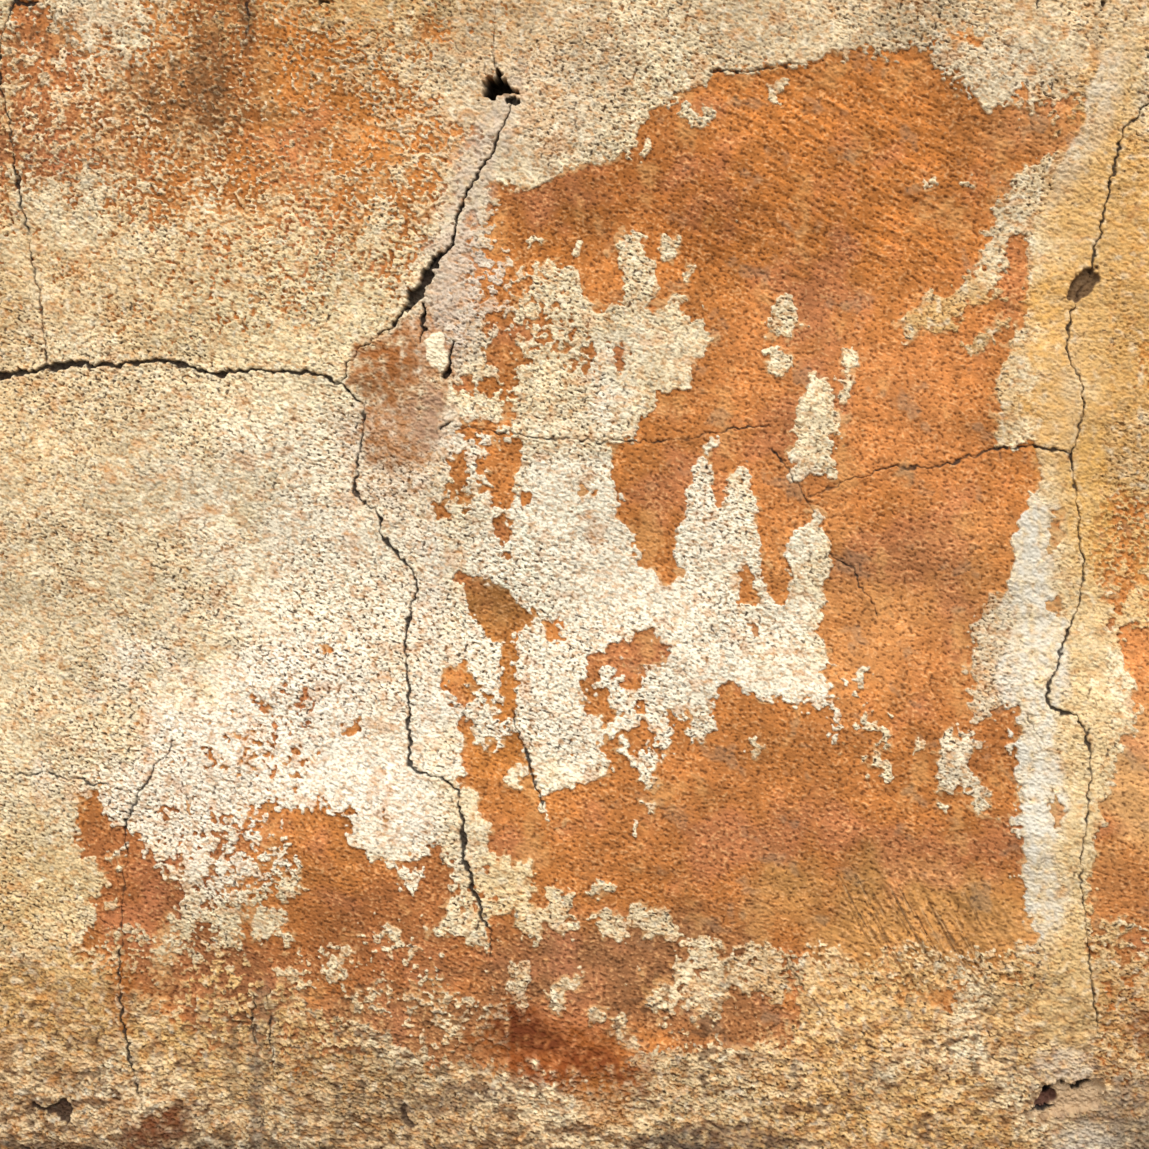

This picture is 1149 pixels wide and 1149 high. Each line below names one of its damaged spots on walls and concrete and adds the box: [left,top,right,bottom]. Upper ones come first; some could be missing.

peeling [946,30,984,48]
crack [1091,103,1149,268]
crack [0,0,511,959]
peeling [104,46,1087,1063]
crack [439,303,1102,1041]
crack [0,740,175,1113]
flaking render [1029,1084,1058,1113]
spalling [1069,1079,1092,1090]